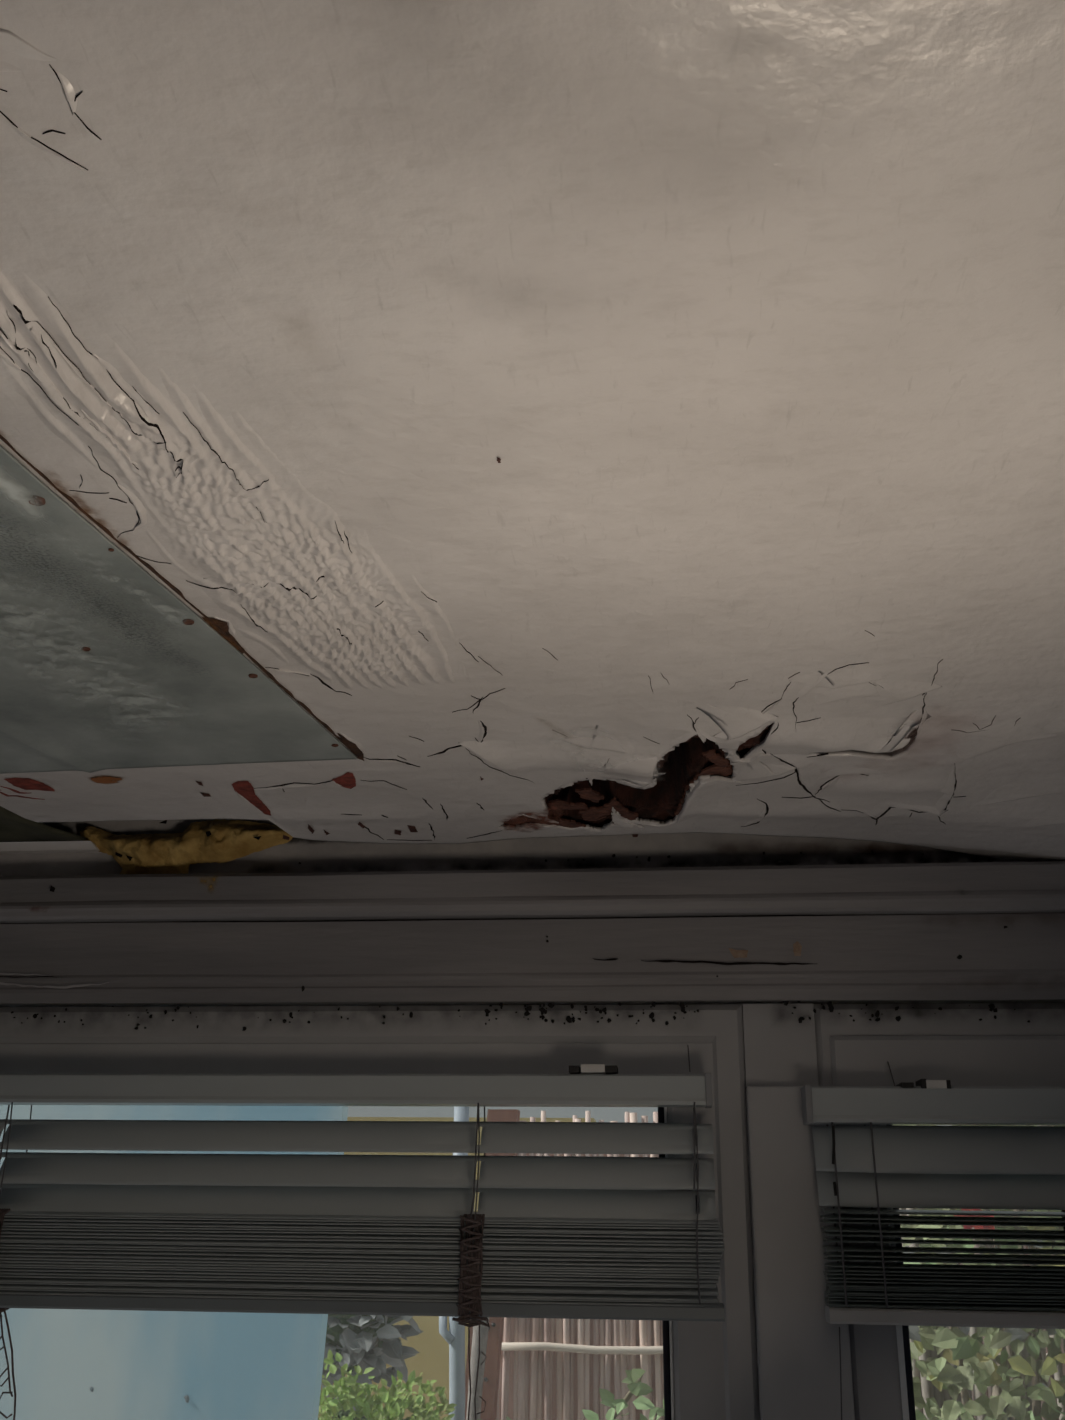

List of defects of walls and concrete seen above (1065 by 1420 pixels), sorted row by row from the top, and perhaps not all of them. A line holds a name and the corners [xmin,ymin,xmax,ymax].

crack [0,64,102,172]
crack [13,297,269,523]
crack [69,446,324,632]
rust [0,435,359,757]
rust [90,776,122,784]
spalling [502,724,796,837]
crack [689,630,1021,827]
mould [485,1002,699,1025]
leakage [783,1001,942,1023]